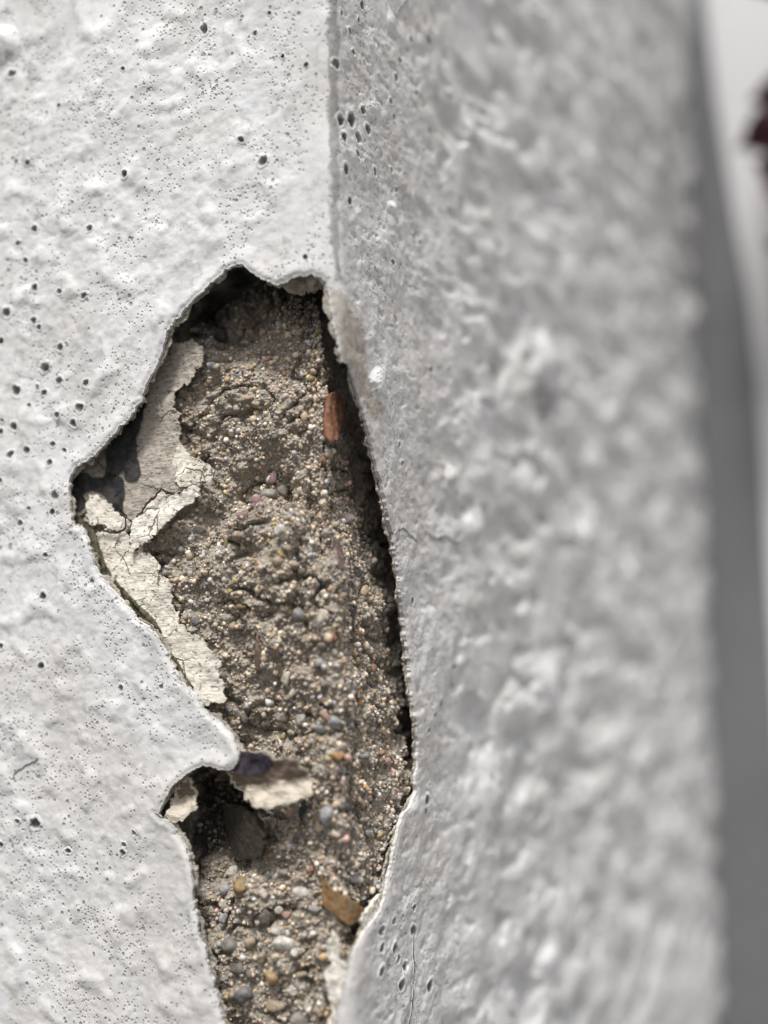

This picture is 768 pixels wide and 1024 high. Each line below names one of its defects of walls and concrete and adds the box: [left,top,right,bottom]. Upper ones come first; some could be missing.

spalling [53,377,91,430]
crack [95,488,182,534]
spalling [75,265,438,1024]